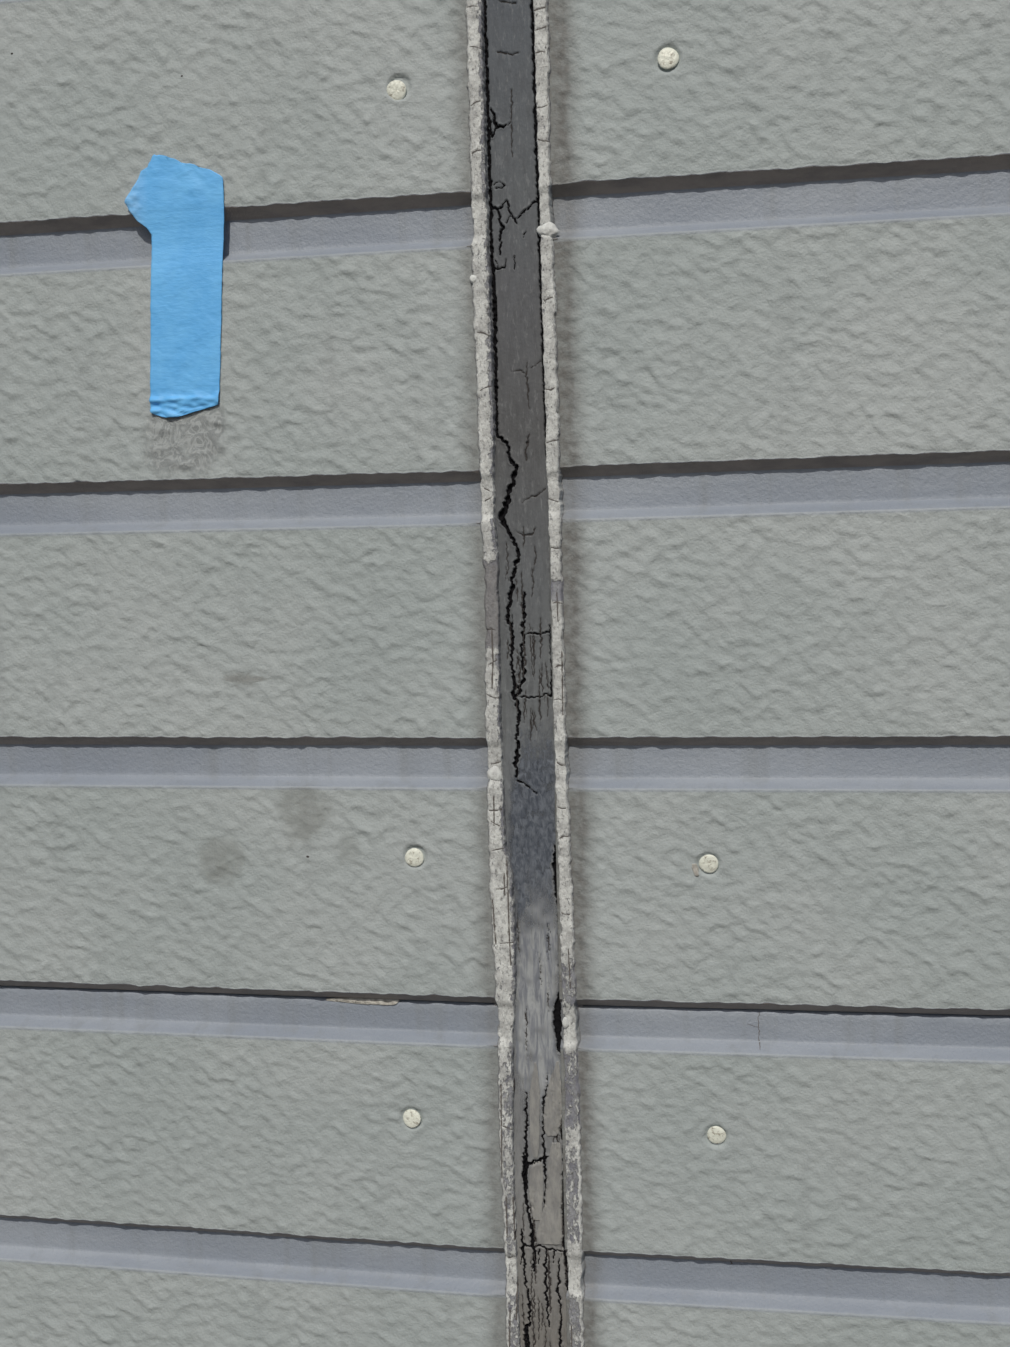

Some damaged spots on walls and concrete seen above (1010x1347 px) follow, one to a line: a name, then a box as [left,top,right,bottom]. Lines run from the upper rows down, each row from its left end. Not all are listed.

crack [469,0,572,1347]